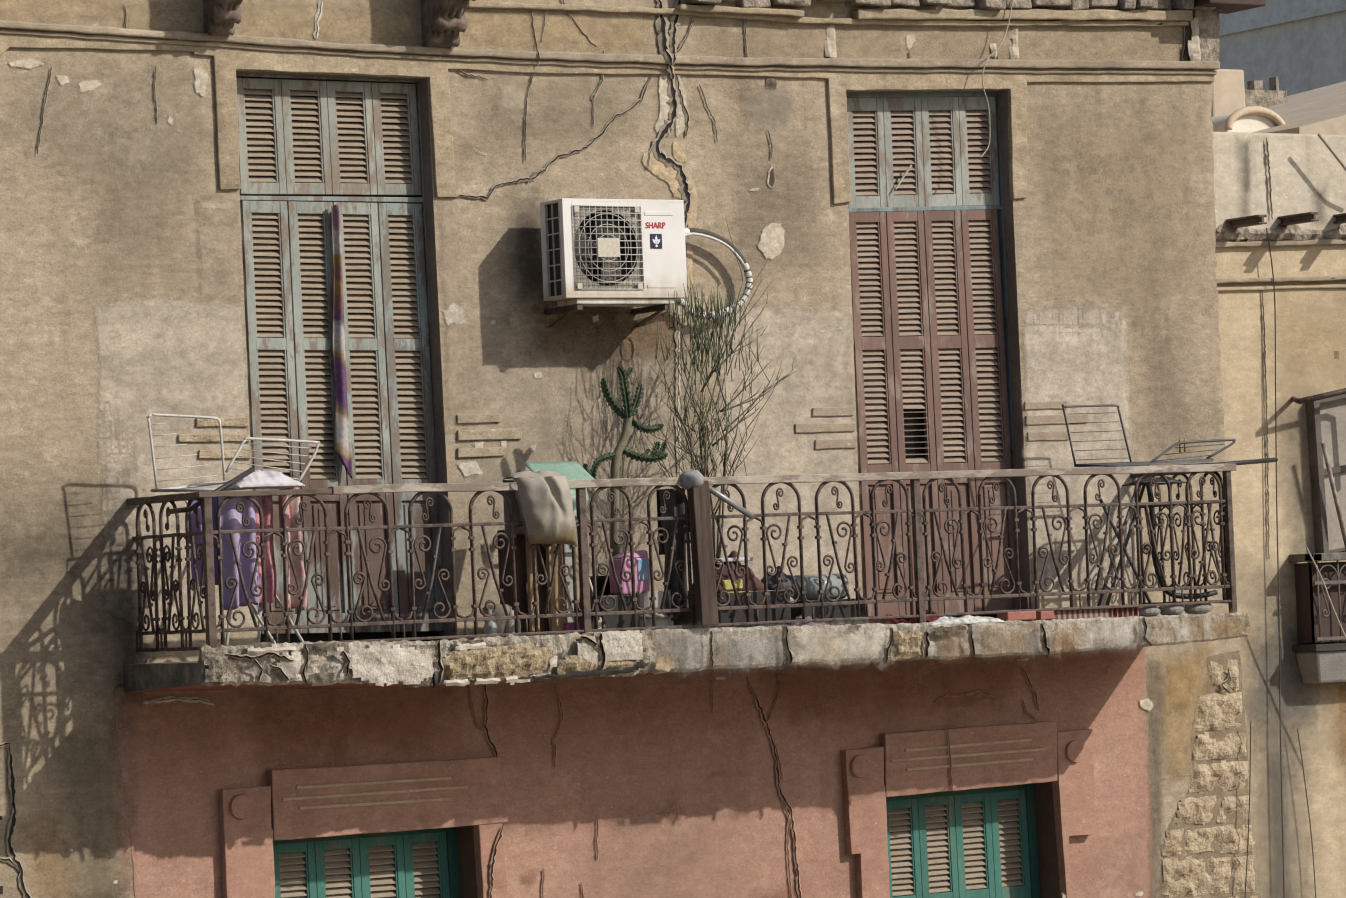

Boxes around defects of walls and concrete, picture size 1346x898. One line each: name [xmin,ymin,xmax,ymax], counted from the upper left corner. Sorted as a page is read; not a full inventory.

crack [453,0,718,472]
peeling [758,223,785,260]
spalling [204,630,677,688]
crack [580,633,606,669]
spalling [827,657,871,665]
spalling [891,625,969,660]
crack [433,640,503,777]
crack [747,627,802,898]
spalling [1135,650,1258,898]
crack [0,742,32,898]
crack [489,826,504,898]